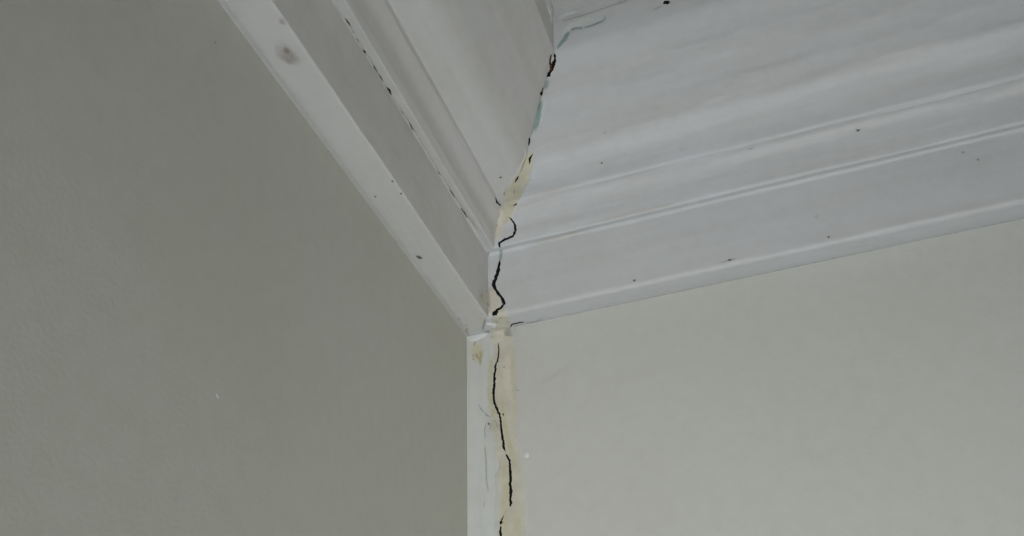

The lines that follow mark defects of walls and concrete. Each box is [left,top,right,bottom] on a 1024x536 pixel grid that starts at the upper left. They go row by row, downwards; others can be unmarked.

crack [332,0,543,536]
crack [547,53,556,77]